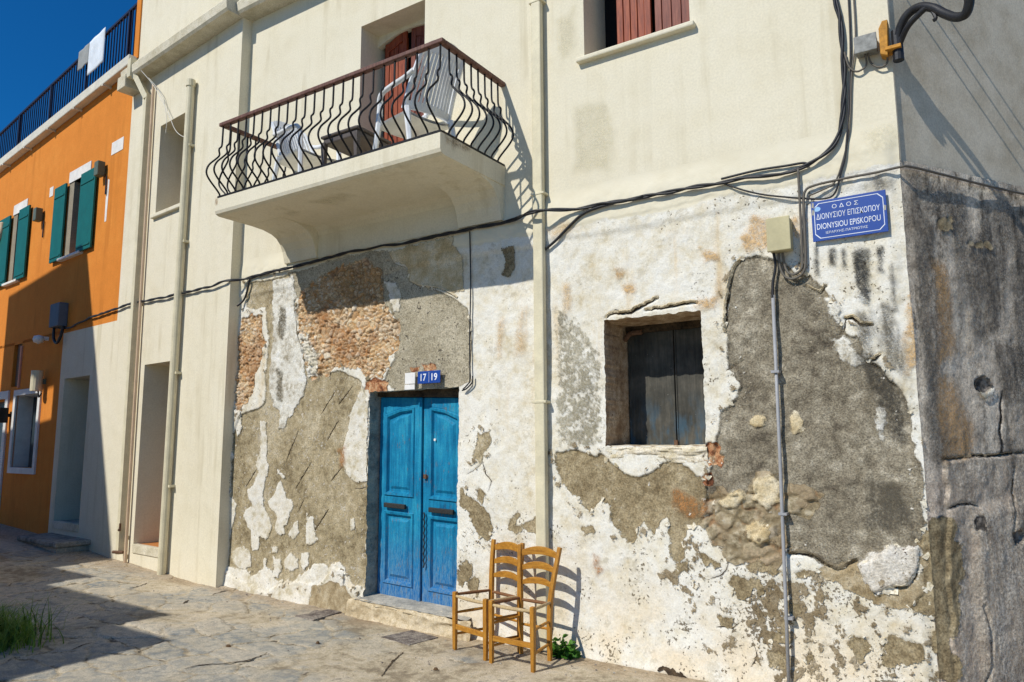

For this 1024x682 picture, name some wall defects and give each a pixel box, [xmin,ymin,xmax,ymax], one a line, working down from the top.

flaking render [223,236,472,613]
peeling [501,246,515,277]
crack [605,295,698,318]
flaking render [548,243,965,682]
damp [814,245,907,440]
damp [911,177,1024,463]
crack [943,396,1023,519]
peeling [456,559,479,598]